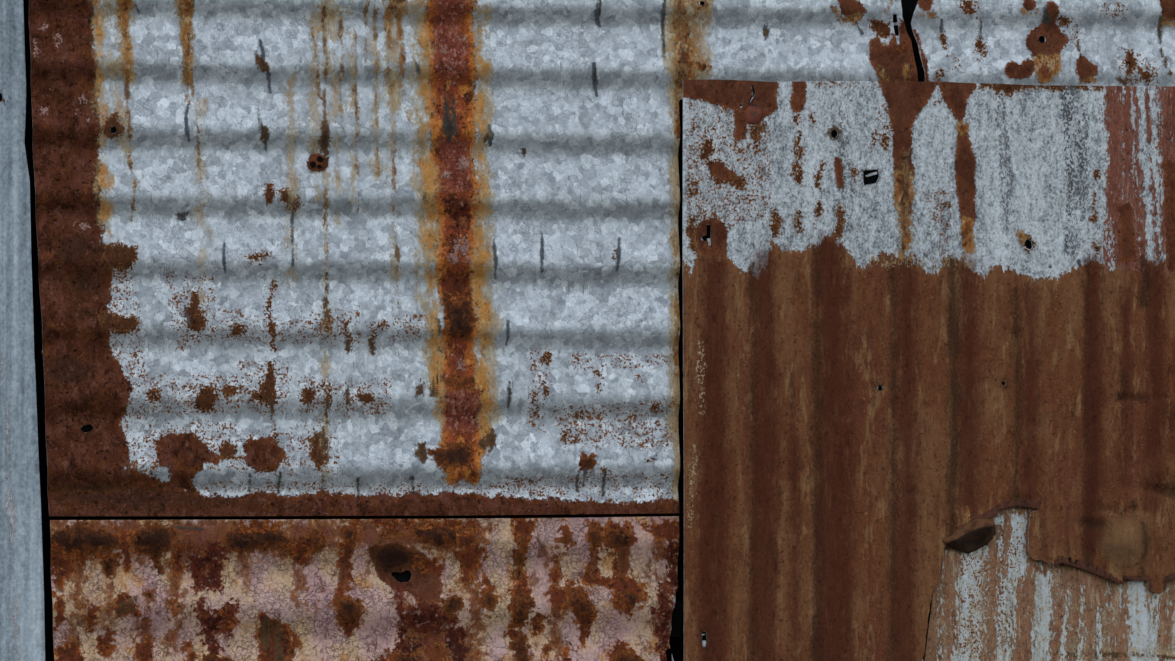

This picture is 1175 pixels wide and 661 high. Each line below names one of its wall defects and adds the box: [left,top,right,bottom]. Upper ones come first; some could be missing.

corrosion [29,0,680,661]
corrosion [672,0,1175,661]